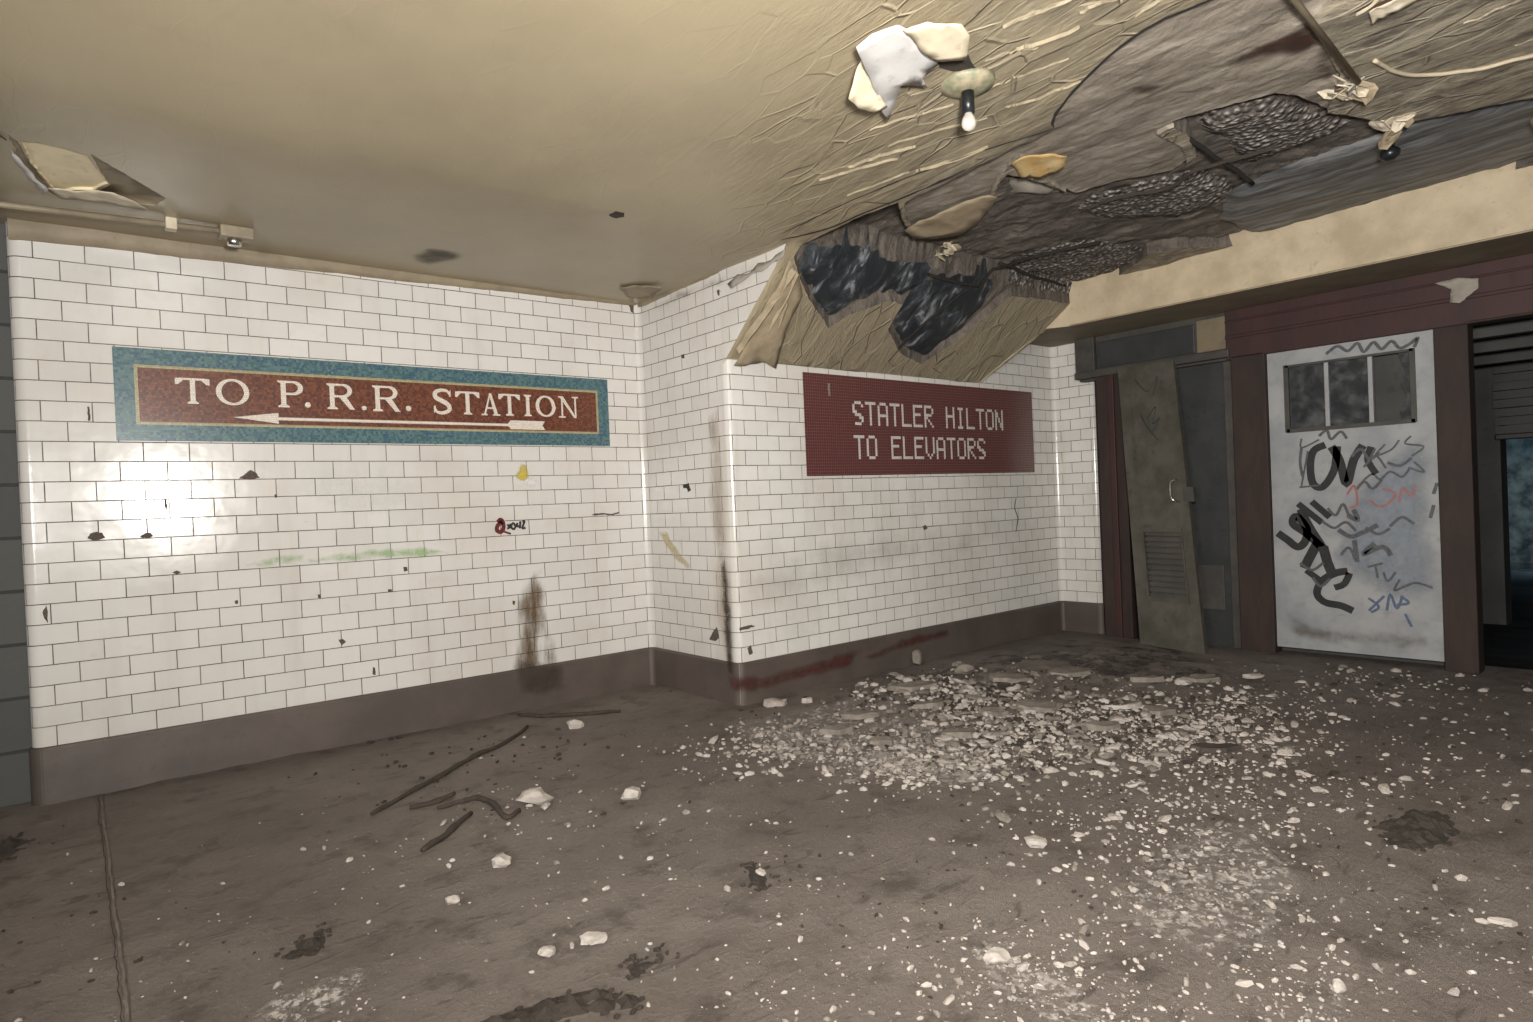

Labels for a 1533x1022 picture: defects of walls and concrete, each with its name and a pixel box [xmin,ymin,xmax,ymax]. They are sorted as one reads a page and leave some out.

peeling [7,134,165,209]
flaking render [717,0,1533,369]
crack [98,796,122,1022]